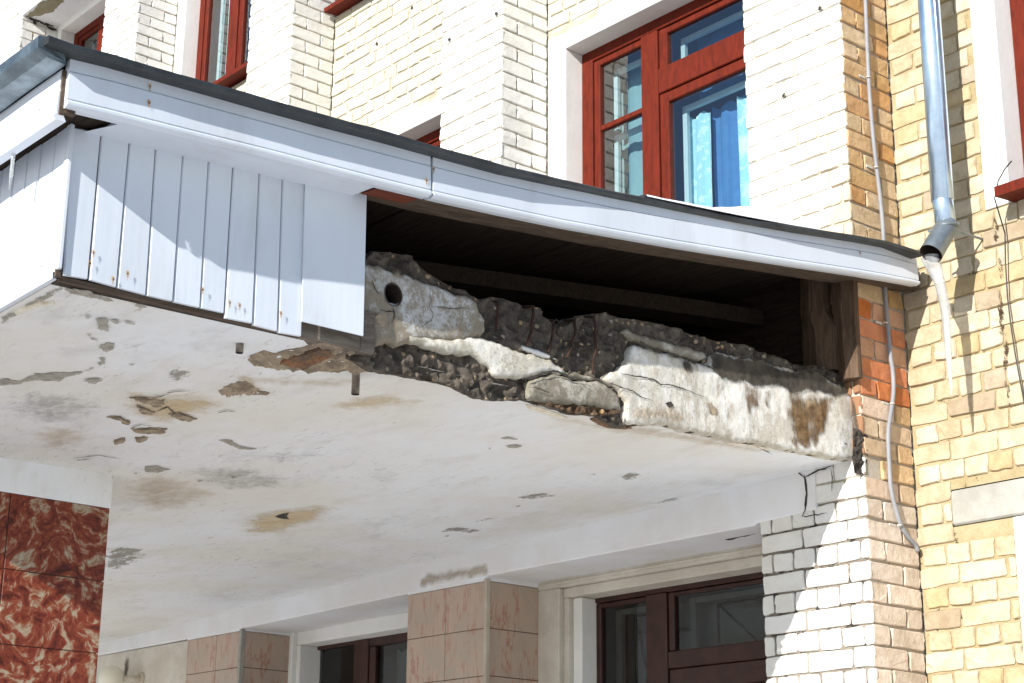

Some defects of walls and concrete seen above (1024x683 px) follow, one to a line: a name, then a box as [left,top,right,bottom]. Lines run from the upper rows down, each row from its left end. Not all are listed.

peeling [0,317,135,386]
spalling [248,251,868,475]
spalling [218,381,270,398]
peeling [107,397,197,445]
rust [787,393,833,448]
crack [798,465,833,517]
damp [253,510,318,532]
damp [421,567,485,585]